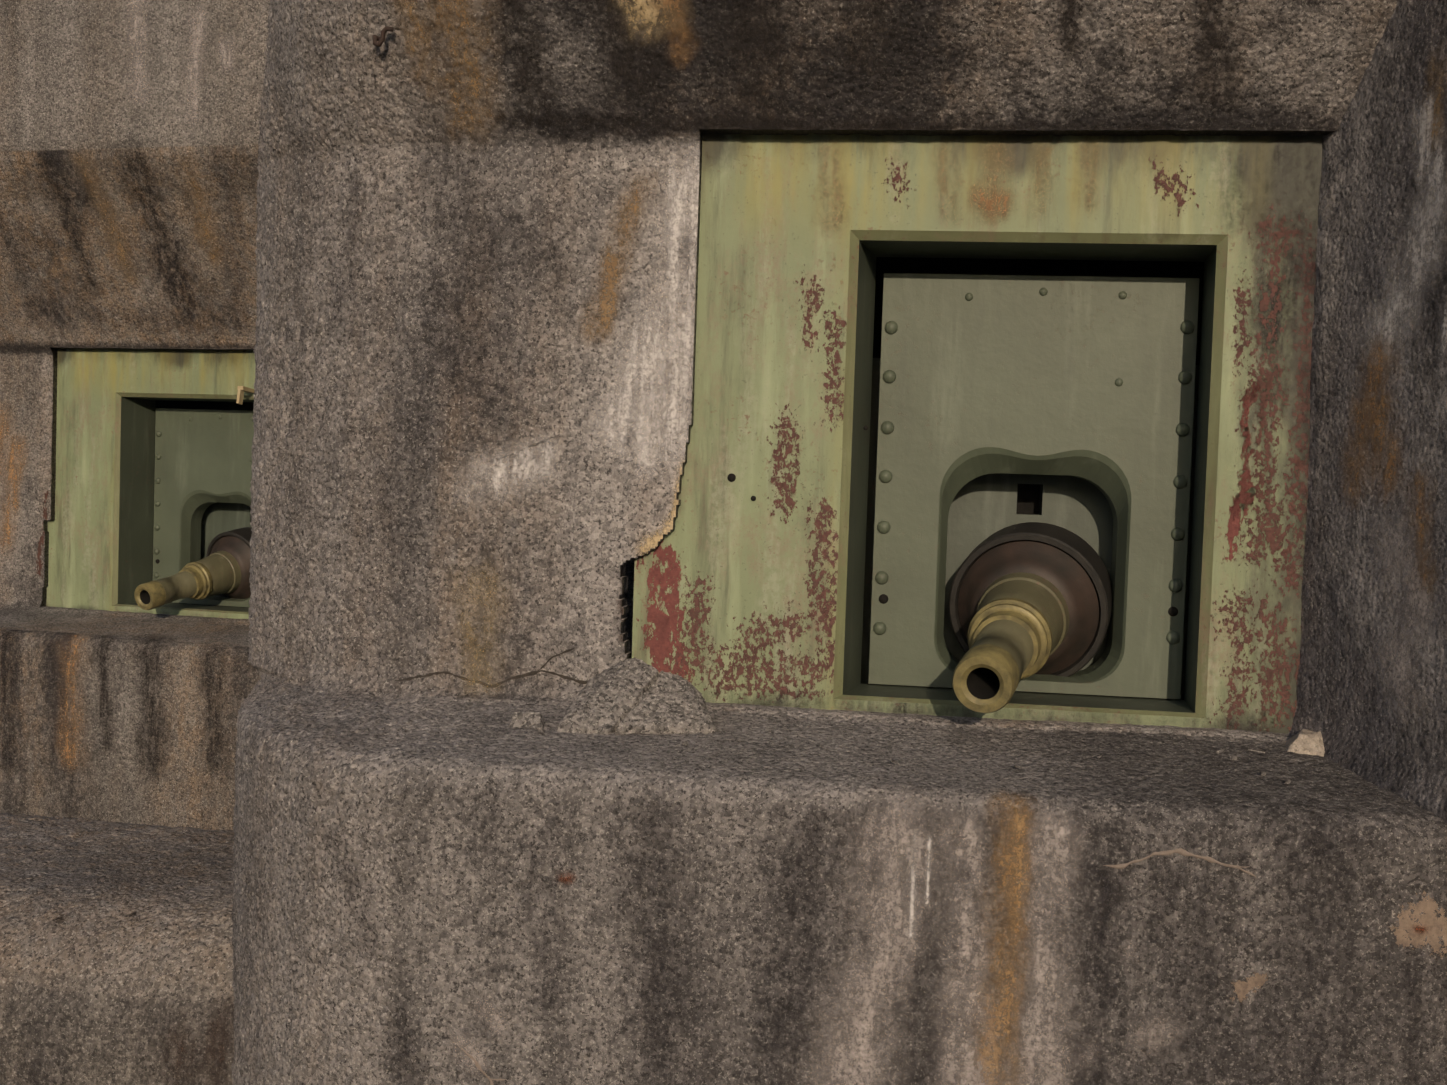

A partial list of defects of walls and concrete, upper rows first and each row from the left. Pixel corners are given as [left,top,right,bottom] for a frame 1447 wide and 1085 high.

leakage [43,156,96,295]
leakage [119,149,200,315]
peeling [619,264,847,708]
corrosion [976,799,1027,1085]
crack [1103,848,1256,877]
spalling [1389,891,1447,959]